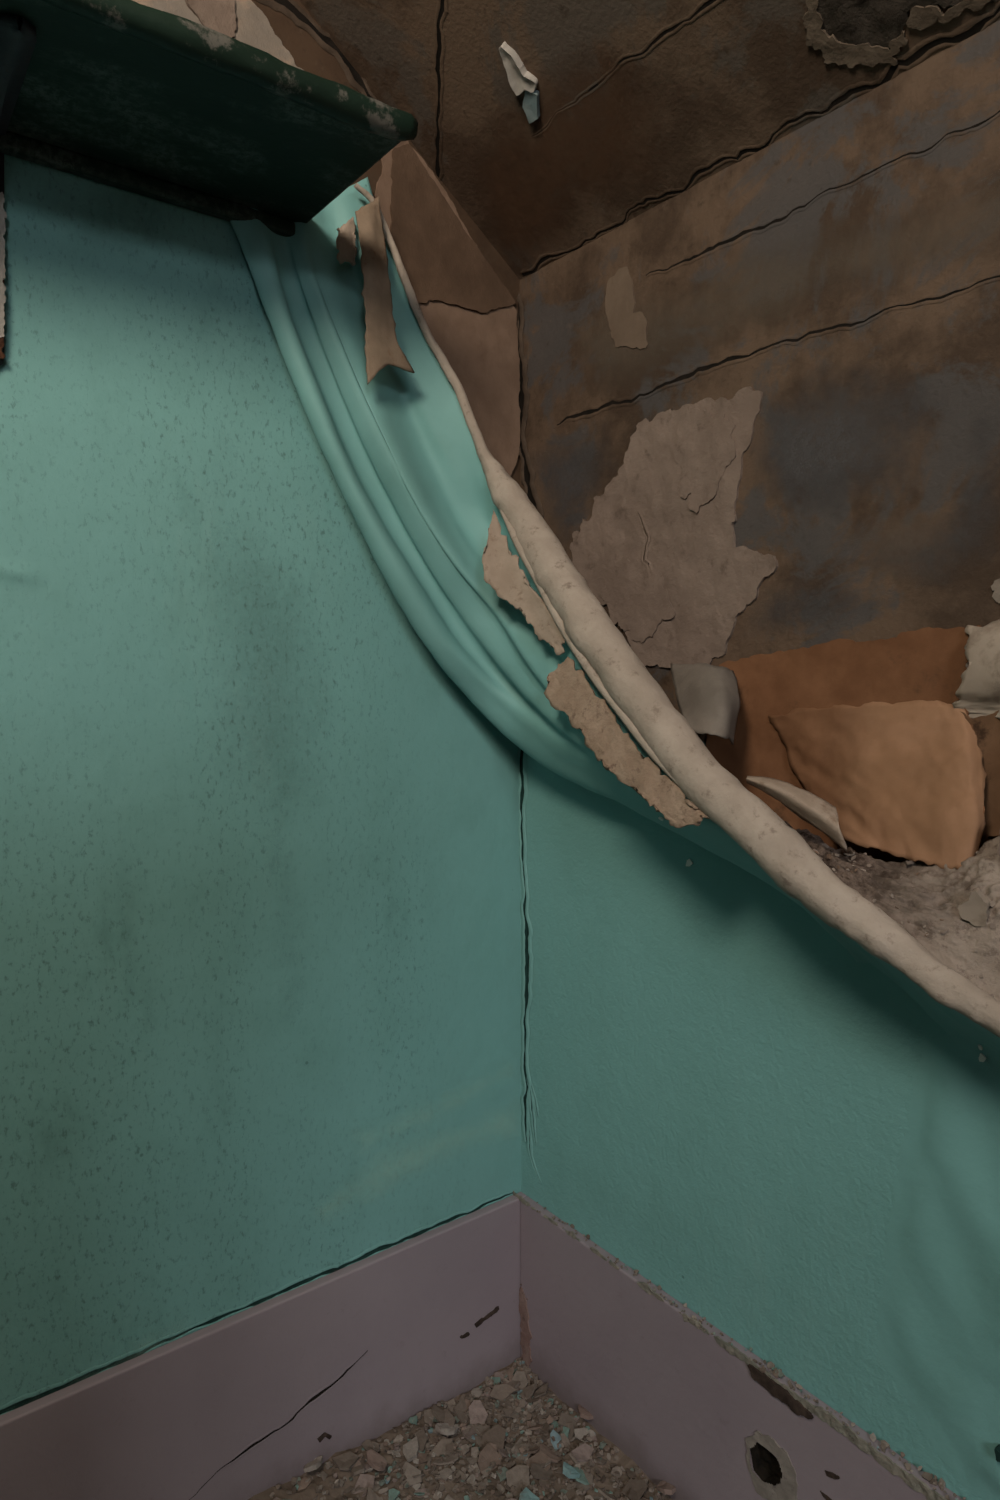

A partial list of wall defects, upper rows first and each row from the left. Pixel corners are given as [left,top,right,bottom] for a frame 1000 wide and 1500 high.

peeling [132,0,303,70]
crack [432,0,448,180]
peeling [499,42,540,124]
spalling [802,0,998,68]
crack [517,0,1000,517]
peeling [569,386,779,668]
peeling [991,579,1000,603]
crack [518,748,541,1183]
crack [187,1349,369,1500]
spalling [513,1191,966,1500]